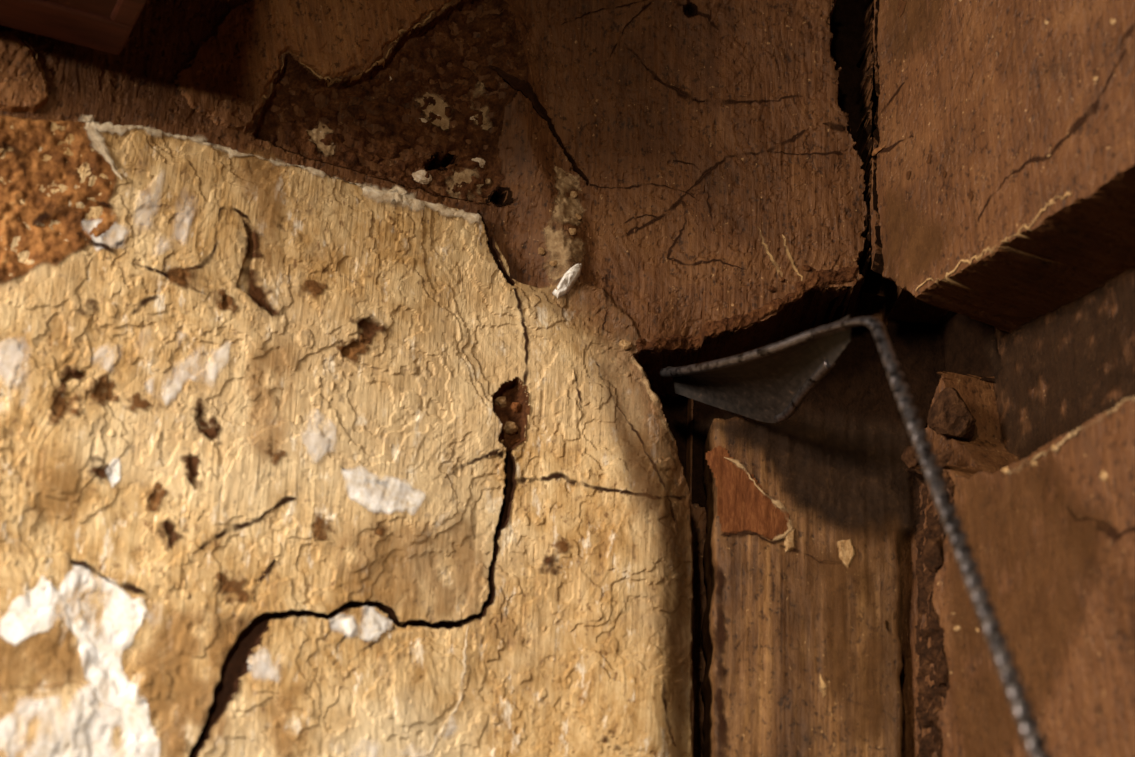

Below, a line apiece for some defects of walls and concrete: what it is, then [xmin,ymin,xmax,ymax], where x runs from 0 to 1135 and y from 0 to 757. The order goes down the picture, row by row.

spalling [0,0,528,283]
crack [488,0,913,302]
spalling [168,267,196,286]
crack [133,207,248,313]
spalling [216,213,279,316]
crack [478,213,529,386]
spalling [538,166,583,298]
crack [601,274,609,330]
flaking render [619,265,859,402]
peeling [706,446,795,552]
crack [189,448,685,757]
flaking render [904,468,961,757]